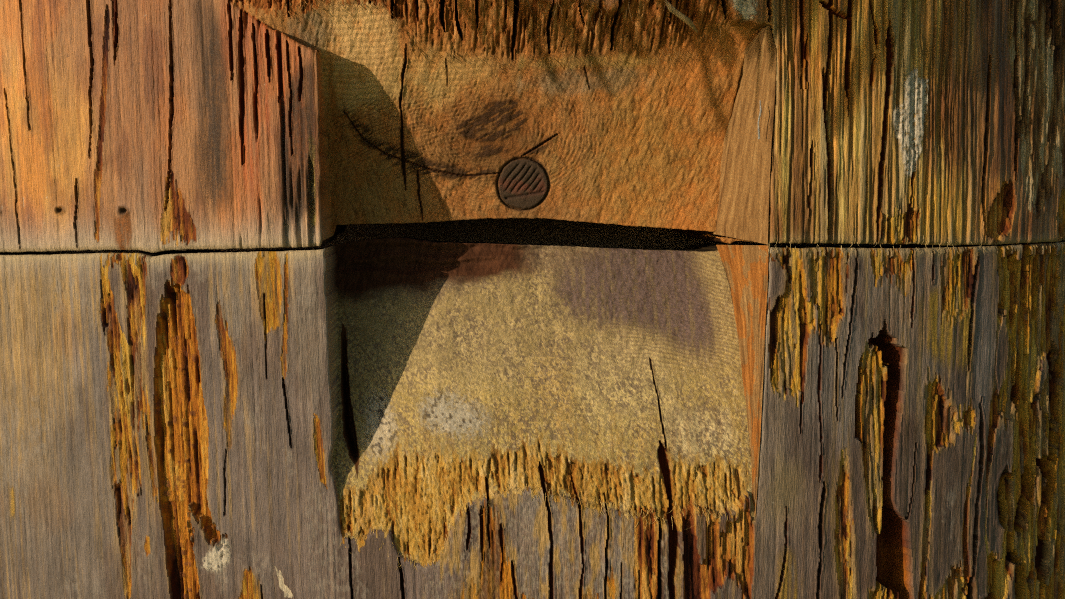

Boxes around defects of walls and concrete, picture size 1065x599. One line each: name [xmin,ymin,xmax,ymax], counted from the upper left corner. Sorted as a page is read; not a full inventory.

crack [4,0,31,250]
crack [73,0,119,248]
crack [799,0,879,241]
crack [910,249,935,328]
crack [347,536,355,599]
crack [397,557,405,599]
crack [466,476,519,599]
crack [538,461,623,599]
crack [649,357,680,599]
crack [775,506,789,599]
crack [799,248,859,599]
spalling [868,319,915,599]